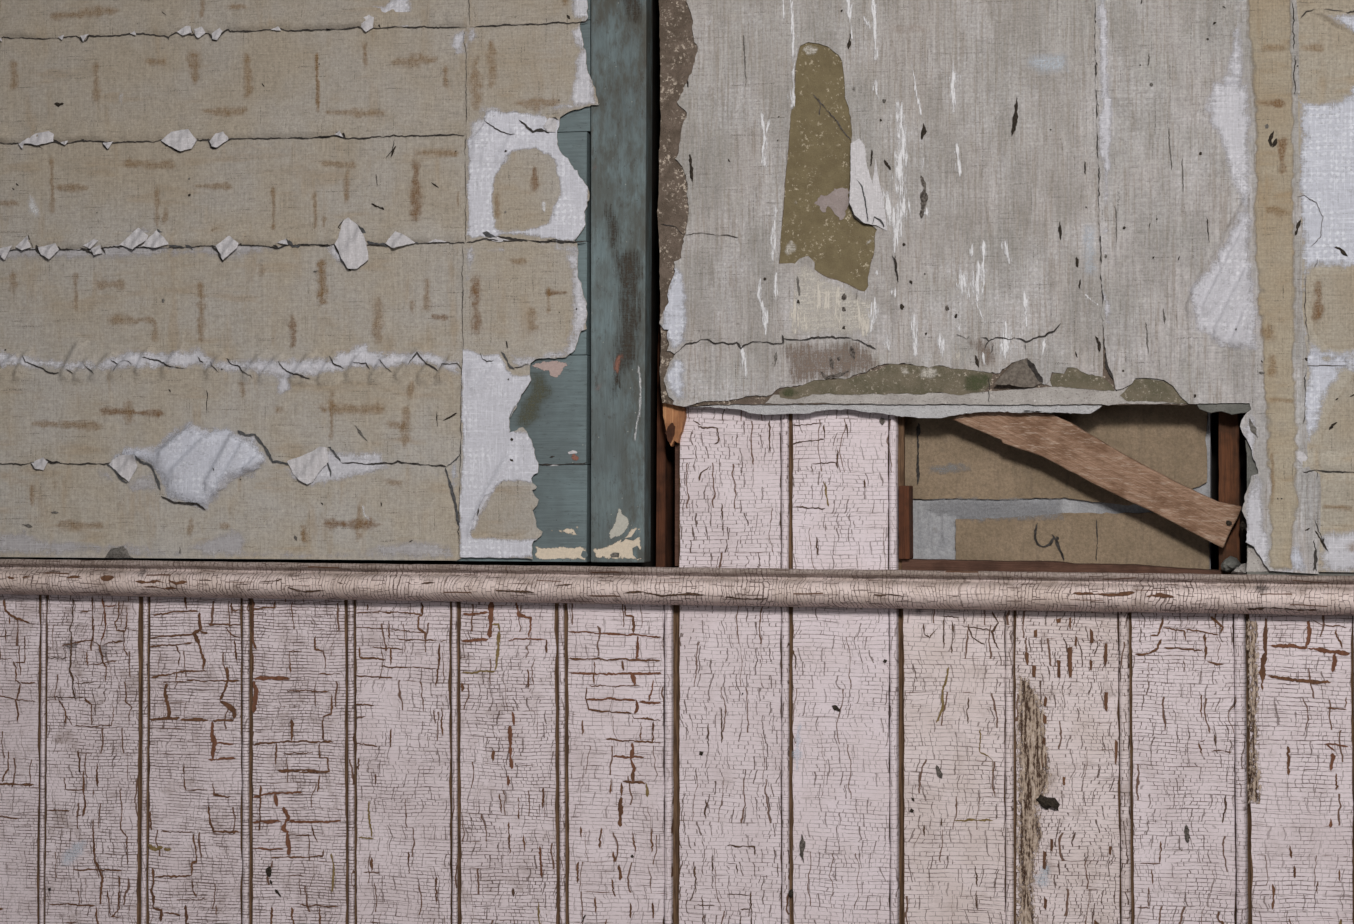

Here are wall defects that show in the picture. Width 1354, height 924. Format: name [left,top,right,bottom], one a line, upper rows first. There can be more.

spalling [657,0,1251,418]
peeling [532,361,567,377]
crack [923,596,999,772]
crack [1136,607,1350,757]
crack [0,579,768,924]
crack [923,818,993,836]
crack [1284,746,1292,775]
crack [1326,743,1348,828]
crack [1137,841,1162,908]
crack [1271,845,1340,910]